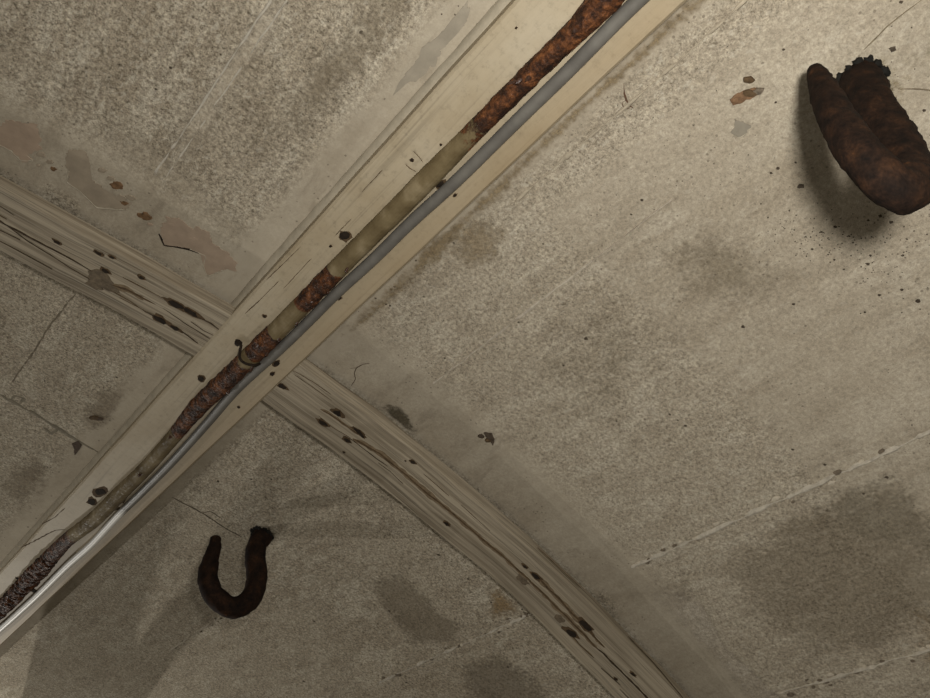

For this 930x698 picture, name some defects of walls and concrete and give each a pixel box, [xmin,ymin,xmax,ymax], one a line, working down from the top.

peeling [36,149,238,277]
rust [361,0,703,323]
peeling [731,120,756,138]
spalling [730,76,764,105]